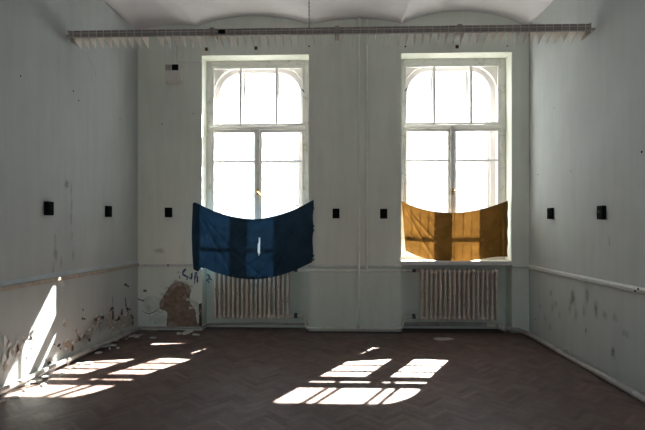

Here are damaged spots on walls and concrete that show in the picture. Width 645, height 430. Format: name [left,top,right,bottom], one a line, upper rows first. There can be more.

peeling [54,296,134,351]
flaking render [156,279,202,327]
peeling [1,329,38,371]